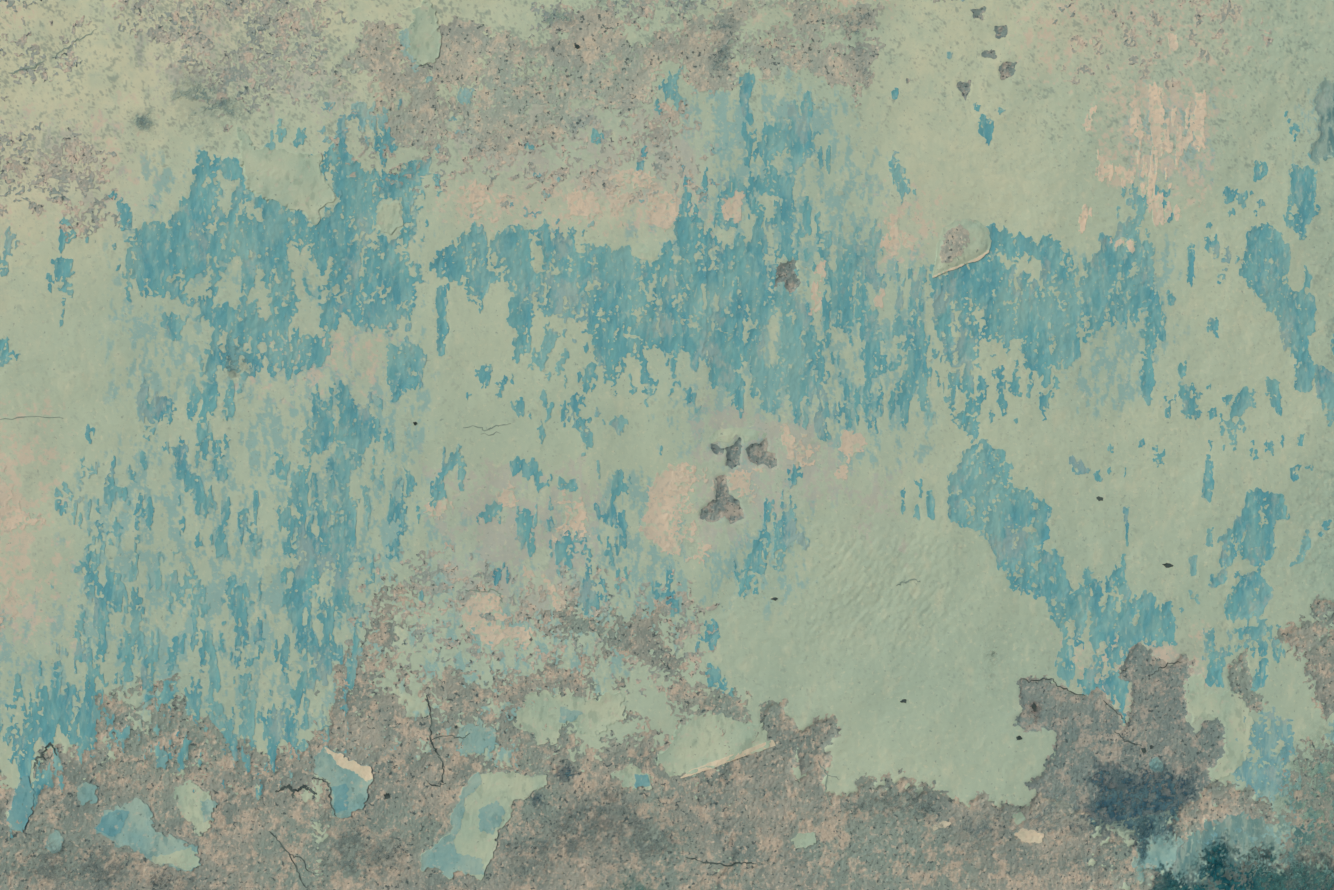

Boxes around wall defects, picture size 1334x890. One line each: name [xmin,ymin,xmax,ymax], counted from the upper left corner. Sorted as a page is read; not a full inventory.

peeling [130,0,335,114]
flaking render [933,0,1017,80]
peeling [956,80,1006,146]
peeling [45,256,75,327]
peeling [1186,77,1334,427]
peeling [1164,360,1284,503]
peeling [476,456,553,557]
peeling [594,469,632,566]
peeling [638,437,777,564]
peeling [221,574,267,670]
crack [426,695,470,787]
crack [275,777,336,816]